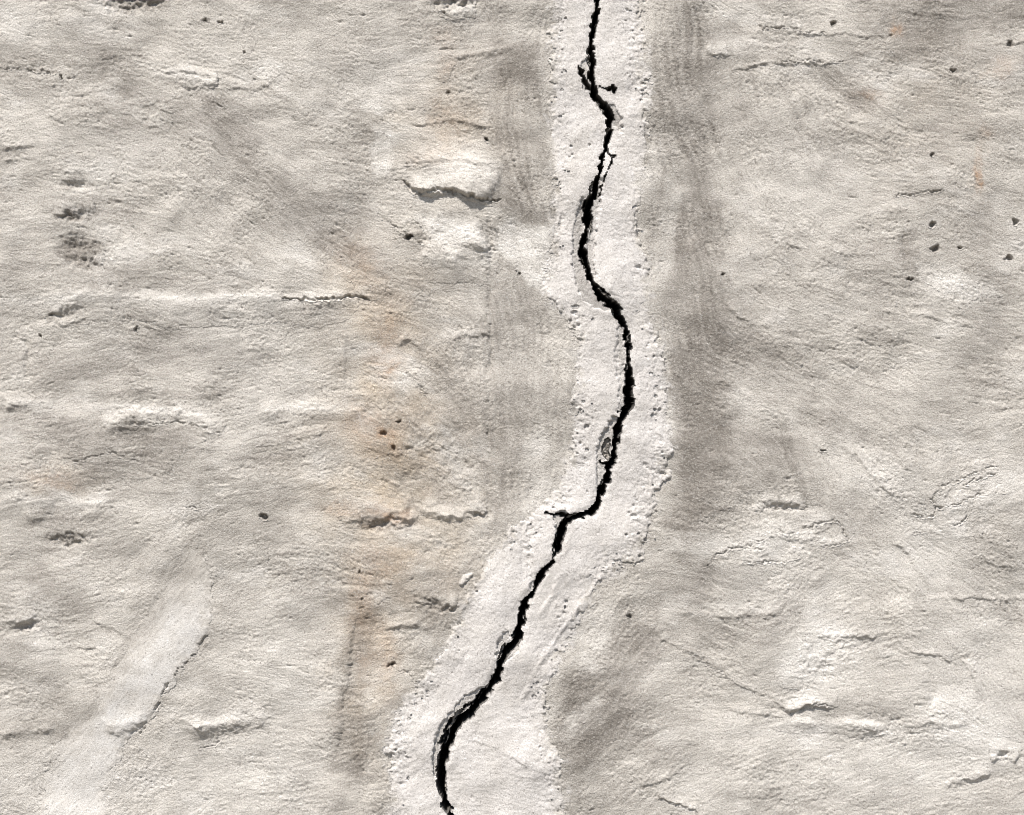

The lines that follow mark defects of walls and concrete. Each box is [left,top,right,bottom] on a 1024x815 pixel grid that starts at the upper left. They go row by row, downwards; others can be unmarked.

crack [403,179,502,203]
crack [435,0,636,815]